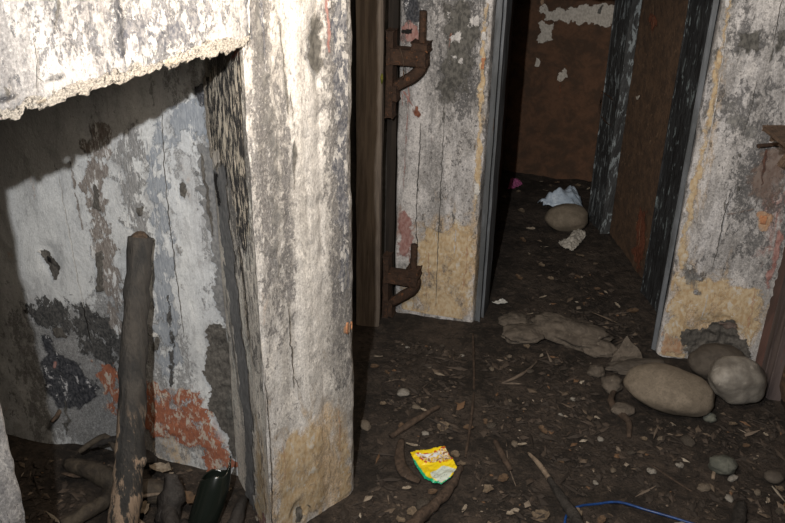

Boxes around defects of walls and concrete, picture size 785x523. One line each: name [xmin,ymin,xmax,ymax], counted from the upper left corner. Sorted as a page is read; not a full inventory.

corrosion [401,22,419,42]
peeling [537,0,614,43]
corrosion [402,86,421,130]
peeling [677,0,732,270]
peeling [0,36,266,523]
damp [401,219,474,319]
damp [658,264,763,358]
spalling [680,319,752,358]
damp [254,416,351,523]